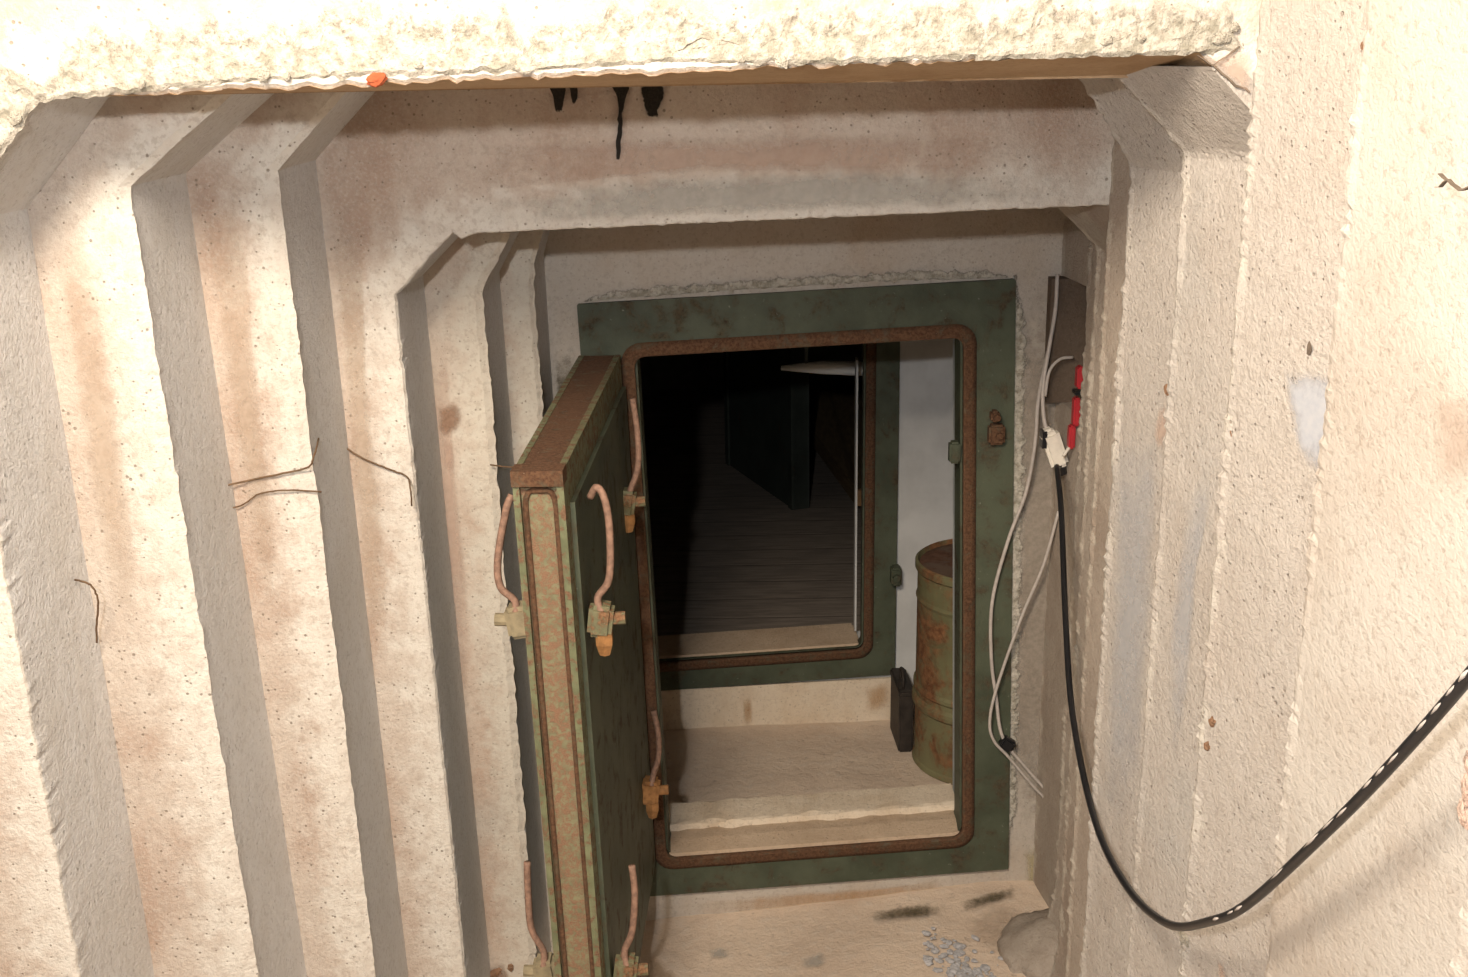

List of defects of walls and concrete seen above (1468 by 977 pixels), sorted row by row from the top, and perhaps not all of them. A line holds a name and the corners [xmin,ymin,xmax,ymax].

leakage [550,88,578,112]
leakage [612,86,664,160]
crack [1438,173,1468,191]
corrosion [621,324,977,869]